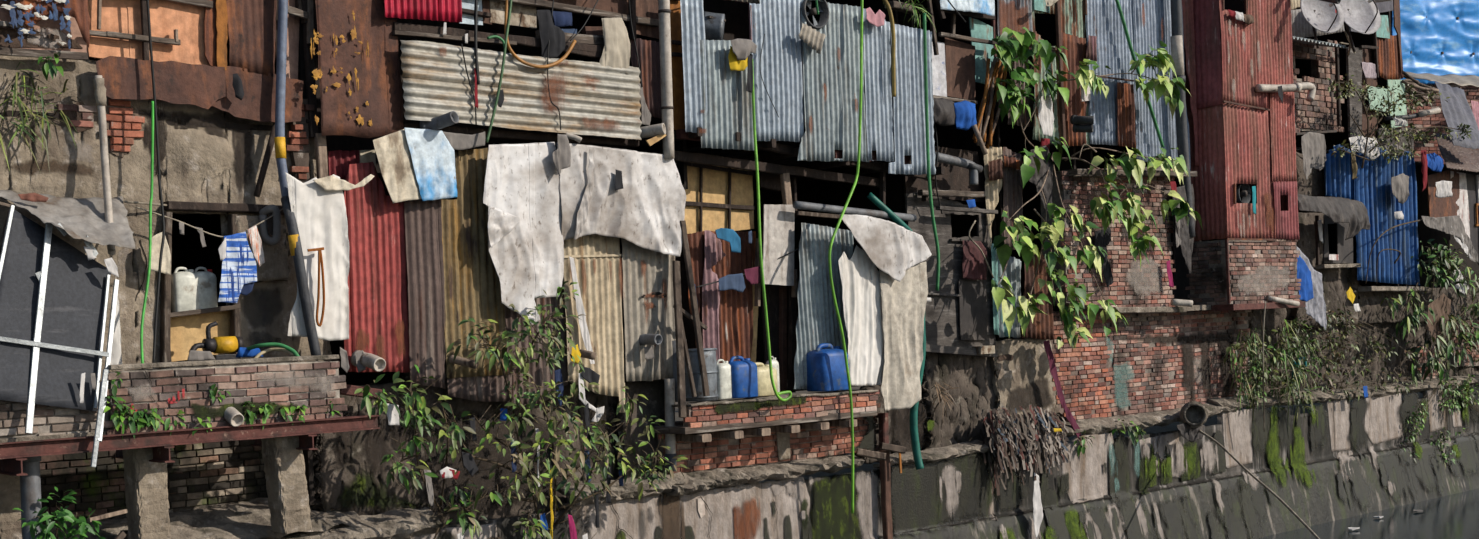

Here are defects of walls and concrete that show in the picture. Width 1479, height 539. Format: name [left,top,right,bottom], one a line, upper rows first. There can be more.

corrosion [543,61,568,112]
corrosion [583,118,615,129]
water stain [856,385,1479,539]